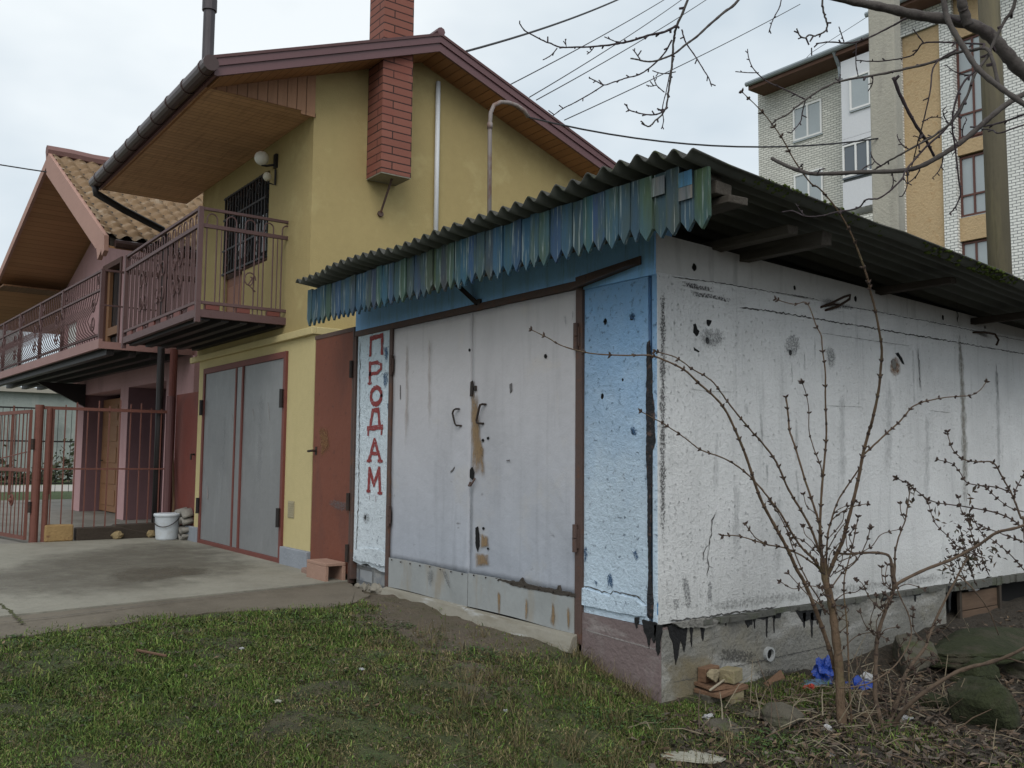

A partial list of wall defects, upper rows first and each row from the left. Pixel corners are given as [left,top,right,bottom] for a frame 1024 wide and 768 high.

rust [471,397,484,472]
rust [476,535,488,565]